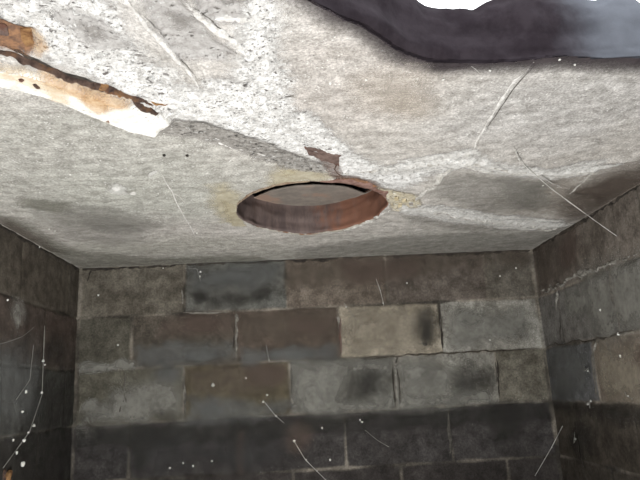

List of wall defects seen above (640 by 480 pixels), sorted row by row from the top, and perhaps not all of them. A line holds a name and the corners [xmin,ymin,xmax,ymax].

peeling [54,8,126,50]
peeling [143,0,247,60]
corrosion [0,19,168,116]
spalling [0,71,326,172]
corrosion [304,146,388,199]
leakage [216,188,245,226]